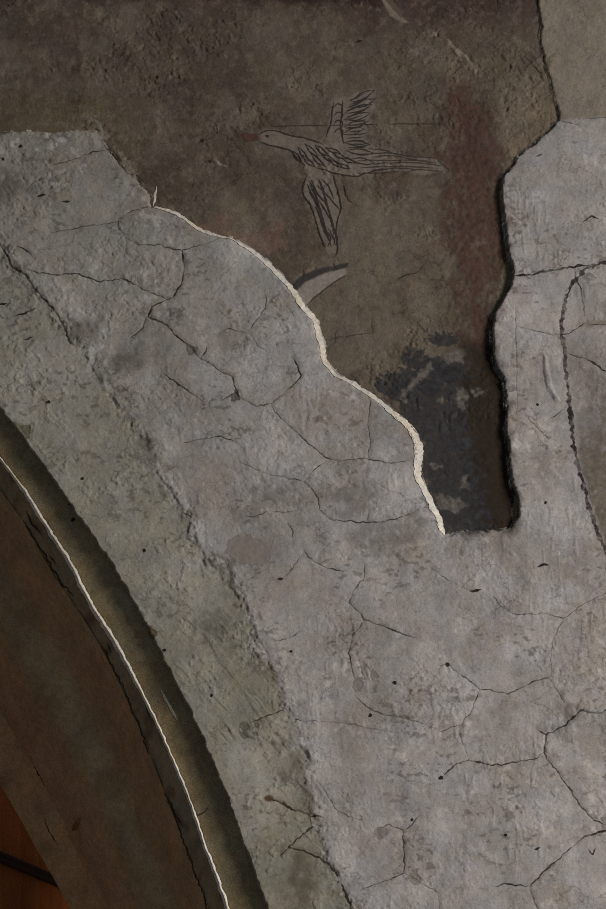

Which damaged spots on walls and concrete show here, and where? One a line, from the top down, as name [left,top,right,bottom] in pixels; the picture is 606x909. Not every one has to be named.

flaking render [381,0,408,23]
crack [1,244,239,397]
flaking render [153,186,445,535]
flaking render [487,261,515,320]
crack [515,264,606,393]
crack [261,403,330,508]
crack [339,514,402,523]
flaking render [511,498,521,520]
crack [290,553,410,672]
crack [440,661,606,887]
crack [164,794,208,909]
crack [272,792,419,909]